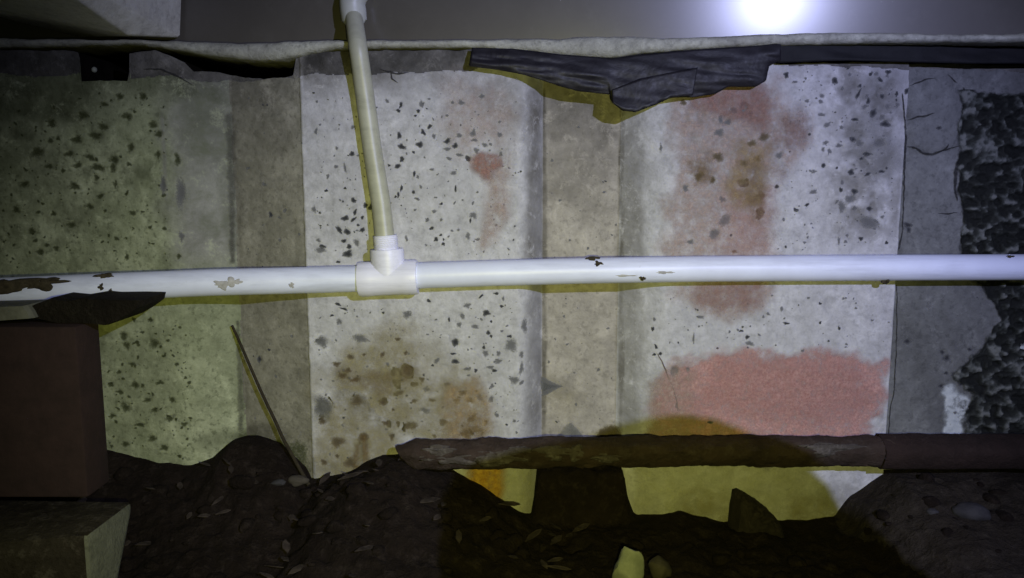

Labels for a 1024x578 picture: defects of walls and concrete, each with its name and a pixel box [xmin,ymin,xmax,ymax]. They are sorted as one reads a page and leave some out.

corrosion [472,153,505,238]
crack [898,75,965,249]
spalling [957,89,1024,254]
corrosion [649,349,889,437]
spalling [926,280,1024,434]